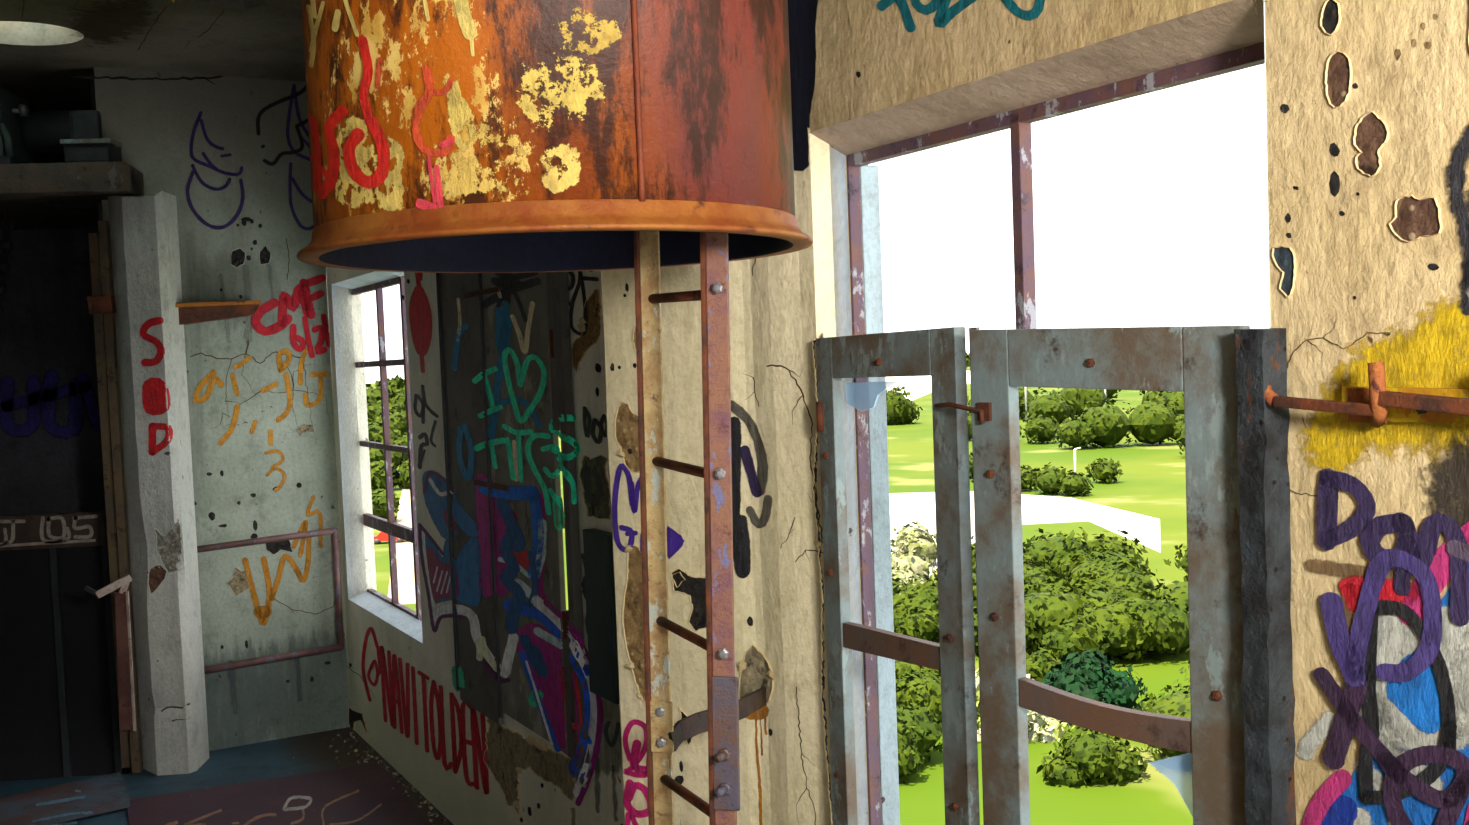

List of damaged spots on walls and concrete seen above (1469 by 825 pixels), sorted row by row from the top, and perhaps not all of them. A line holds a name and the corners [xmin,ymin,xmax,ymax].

flaking render [1320,0,1358,108]
peeling [1395,14,1438,61]
flaking render [1329,111,1390,216]
peeling [860,165,884,334]
flaking render [1389,194,1443,243]
peeling [812,333,824,402]
peeling [867,377,894,632]
peeling [812,422,833,825]
peeling [483,718,577,823]
rust [746,705,769,825]
peeling [876,655,900,825]